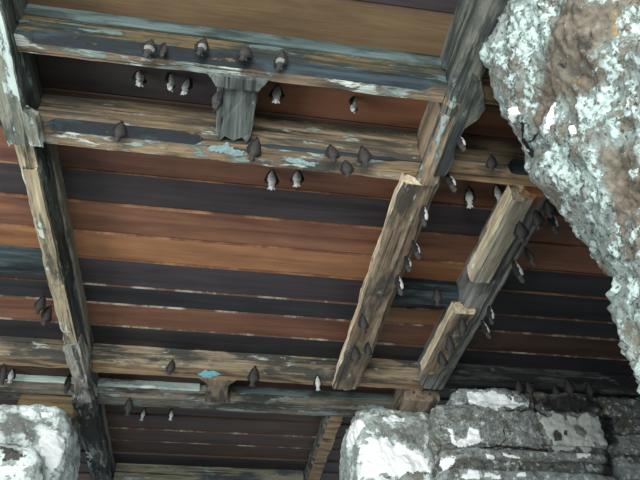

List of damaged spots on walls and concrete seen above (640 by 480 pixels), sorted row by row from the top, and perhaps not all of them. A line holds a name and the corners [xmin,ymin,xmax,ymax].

peeling [205,142,245,157]
peeling [284,156,318,167]